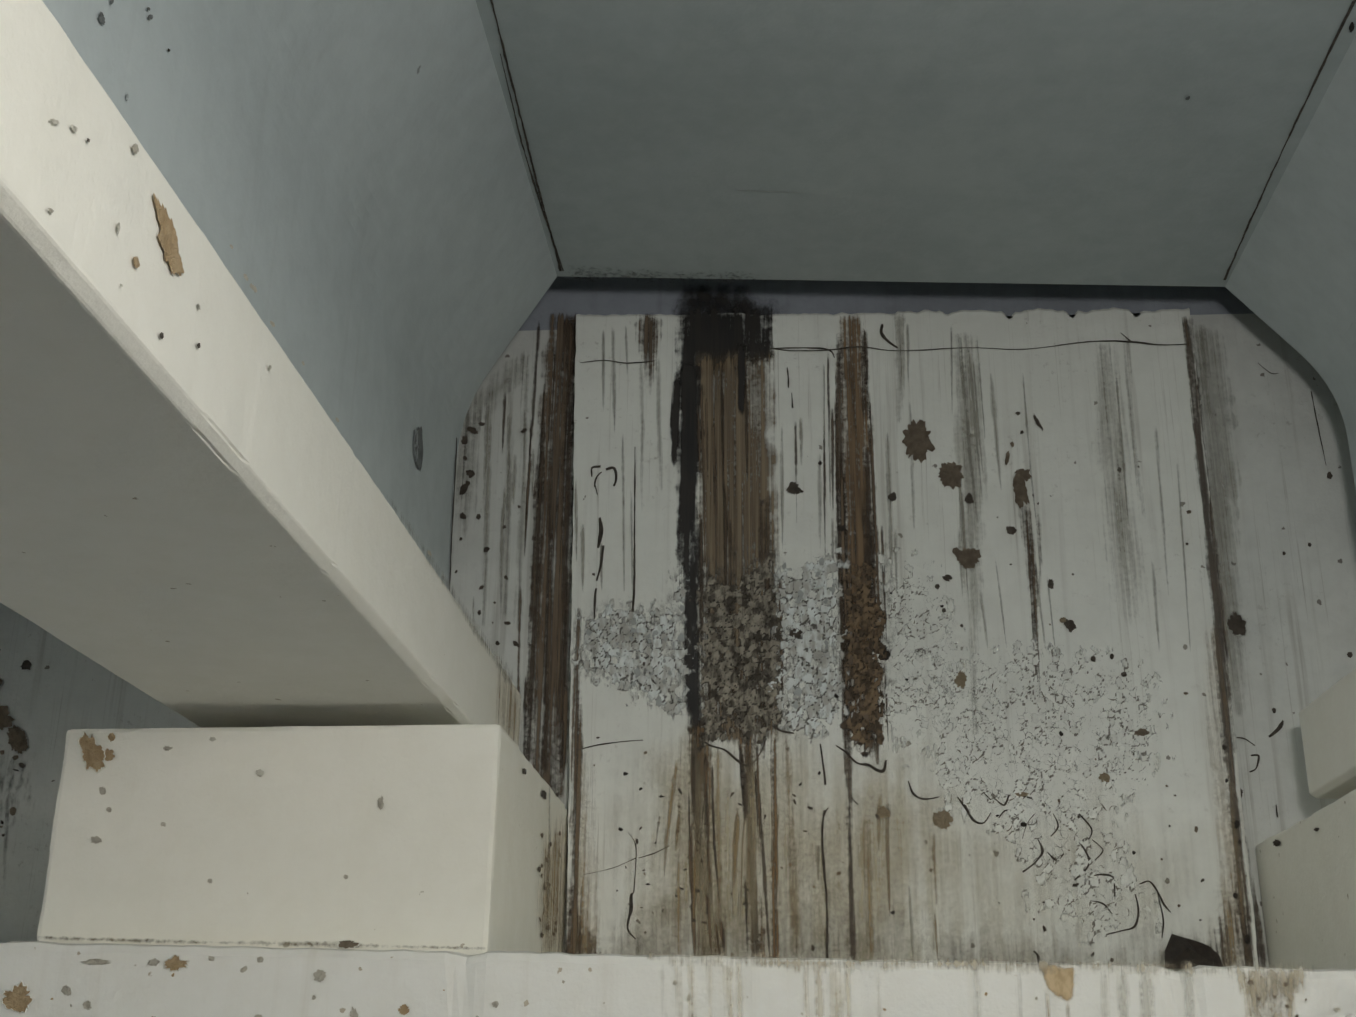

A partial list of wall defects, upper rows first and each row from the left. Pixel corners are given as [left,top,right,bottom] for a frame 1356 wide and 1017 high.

spalling [153,193,184,276]
corrosion [499,313,576,797]
corrosion [665,353,789,958]
corrosion [835,315,890,960]
peeling [571,547,1168,956]
water stain [1182,319,1266,966]